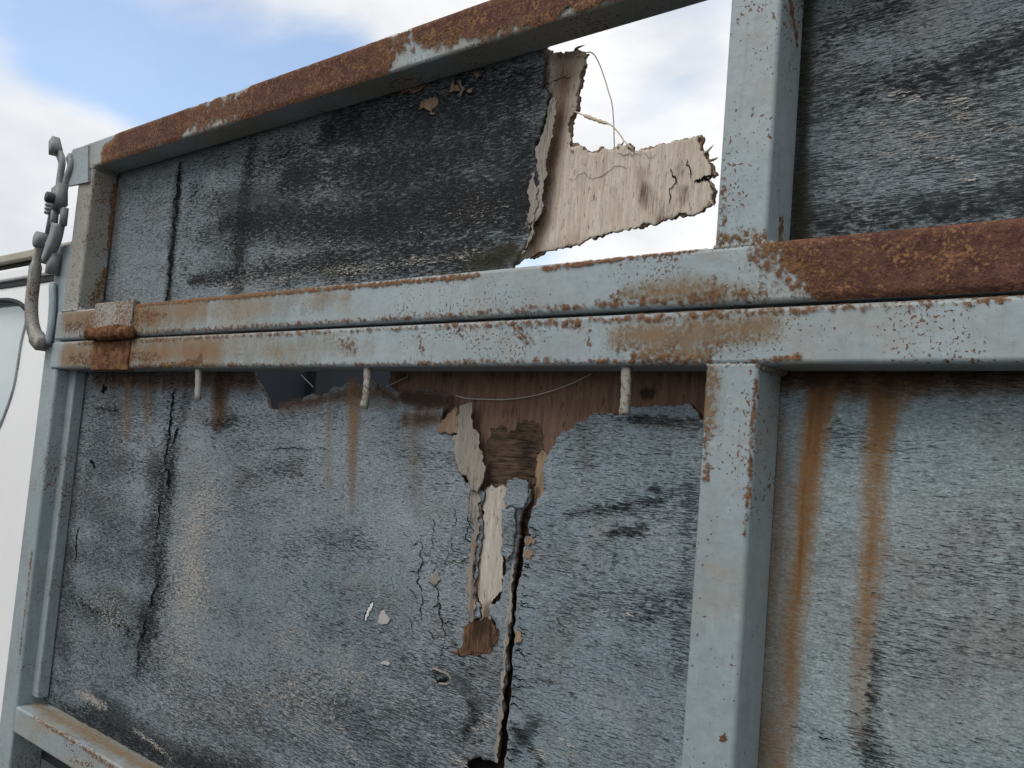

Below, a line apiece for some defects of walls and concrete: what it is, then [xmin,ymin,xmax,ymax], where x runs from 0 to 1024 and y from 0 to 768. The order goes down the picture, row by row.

corrosion [101,0,619,164]
corrosion [60,184,1024,481]
crack [72,374,187,685]
spalling [363,602,390,625]
crack [409,509,479,662]
peeling [430,478,529,686]
crack [494,509,541,768]
corrosion [782,384,834,717]
corrosion [860,383,900,640]